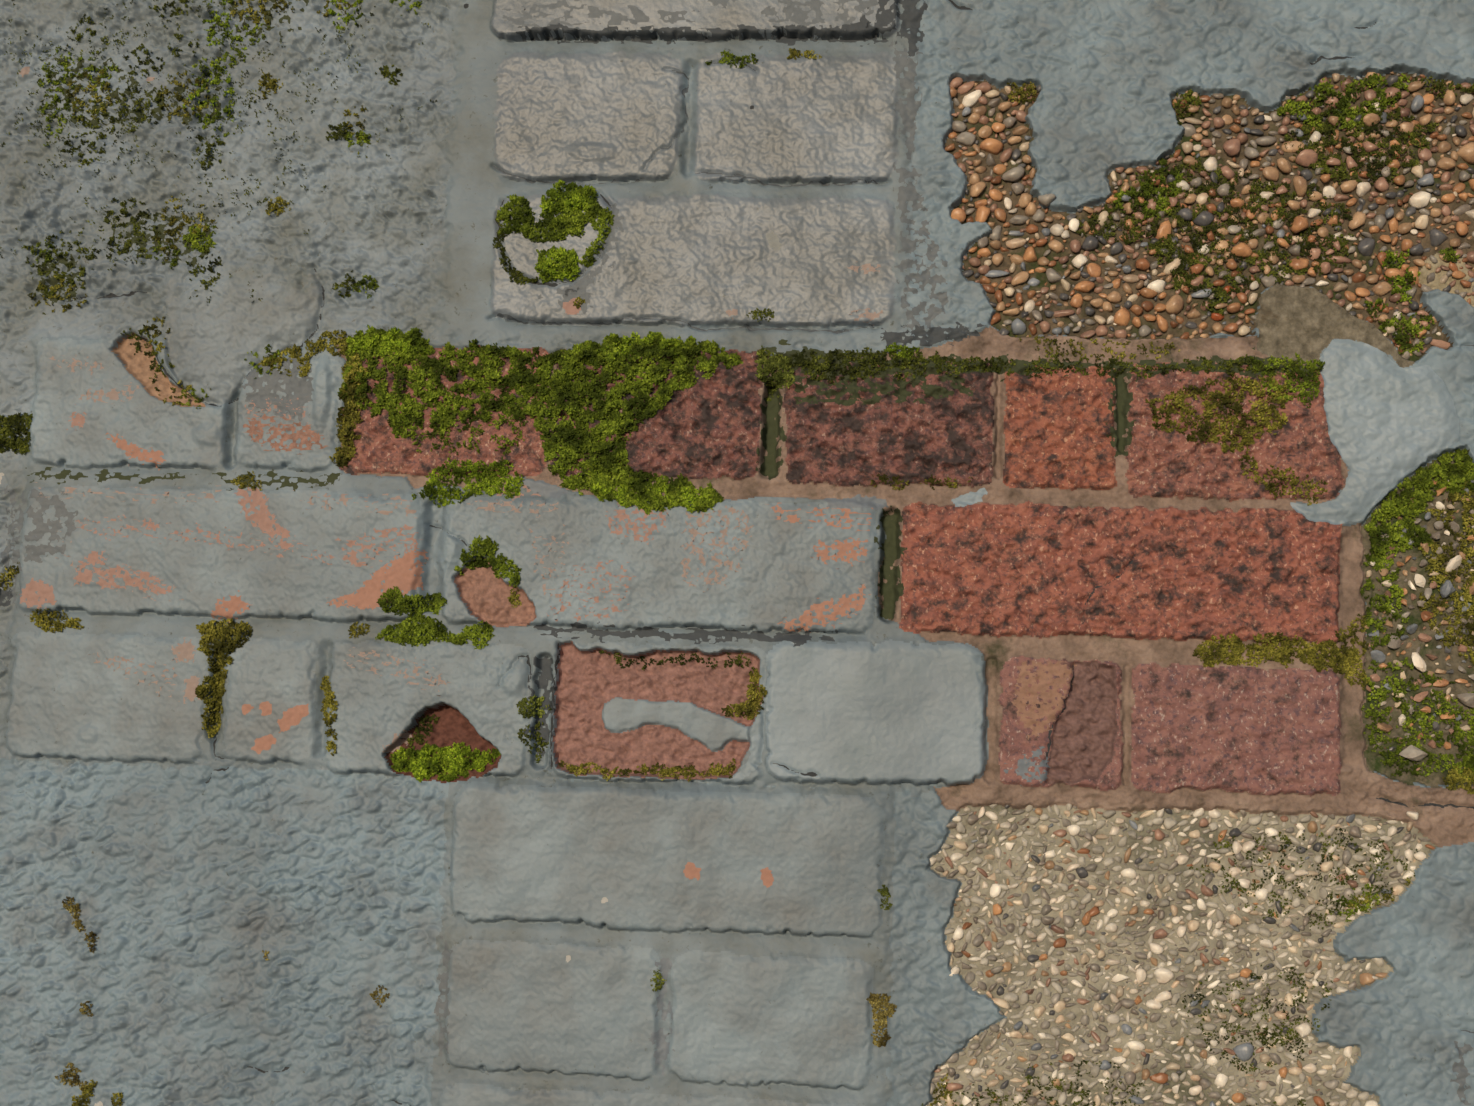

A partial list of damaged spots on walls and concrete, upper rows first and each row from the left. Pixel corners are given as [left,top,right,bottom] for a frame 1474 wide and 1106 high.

peeling [35,326,1349,633]
peeling [88,637,204,704]
peeling [242,701,309,754]
spalling [343,647,501,783]
spalling [552,641,764,780]
peeling [919,523,1474,848]